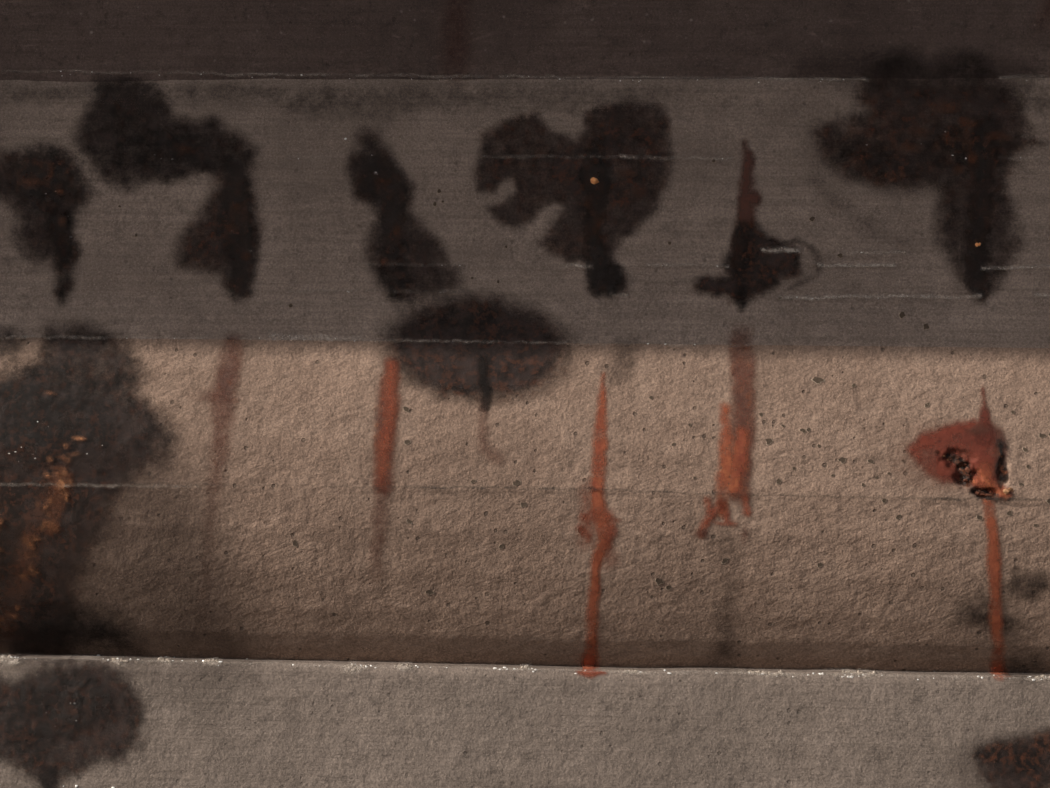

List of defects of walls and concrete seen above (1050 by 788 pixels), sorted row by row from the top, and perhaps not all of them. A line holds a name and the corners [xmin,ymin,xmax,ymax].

water stain [0,77,259,301]
water stain [344,131,567,411]
water stain [477,103,671,296]
water stain [814,57,1037,301]
water stain [0,325,175,788]
water stain [158,656,222,666]
corrosion [374,361,397,502]
corrosion [577,374,616,676]
corrosion [697,330,755,537]
water stain [837,668,883,678]
corrosion [909,388,1010,678]
water stain [974,730,1050,788]